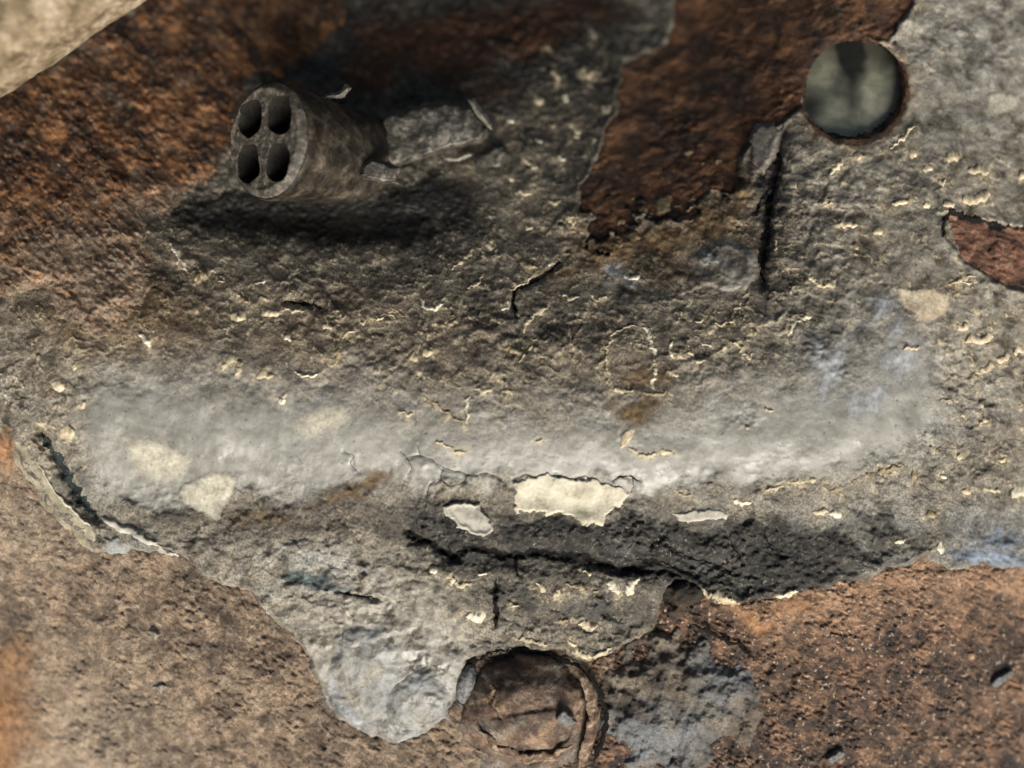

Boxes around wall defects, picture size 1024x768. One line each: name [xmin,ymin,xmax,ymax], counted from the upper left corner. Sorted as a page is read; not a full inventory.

peeling [890,126,946,186]
crack [756,123,784,284]
peeling [923,189,991,209]
peeling [261,307,304,318]
crack [511,252,568,317]
leakage [873,297,898,321]
peeling [52,380,65,392]
leakage [812,344,846,396]
leakage [848,387,890,417]
leakage [886,321,921,377]
crack [41,433,98,517]
spalling [0,418,1024,768]